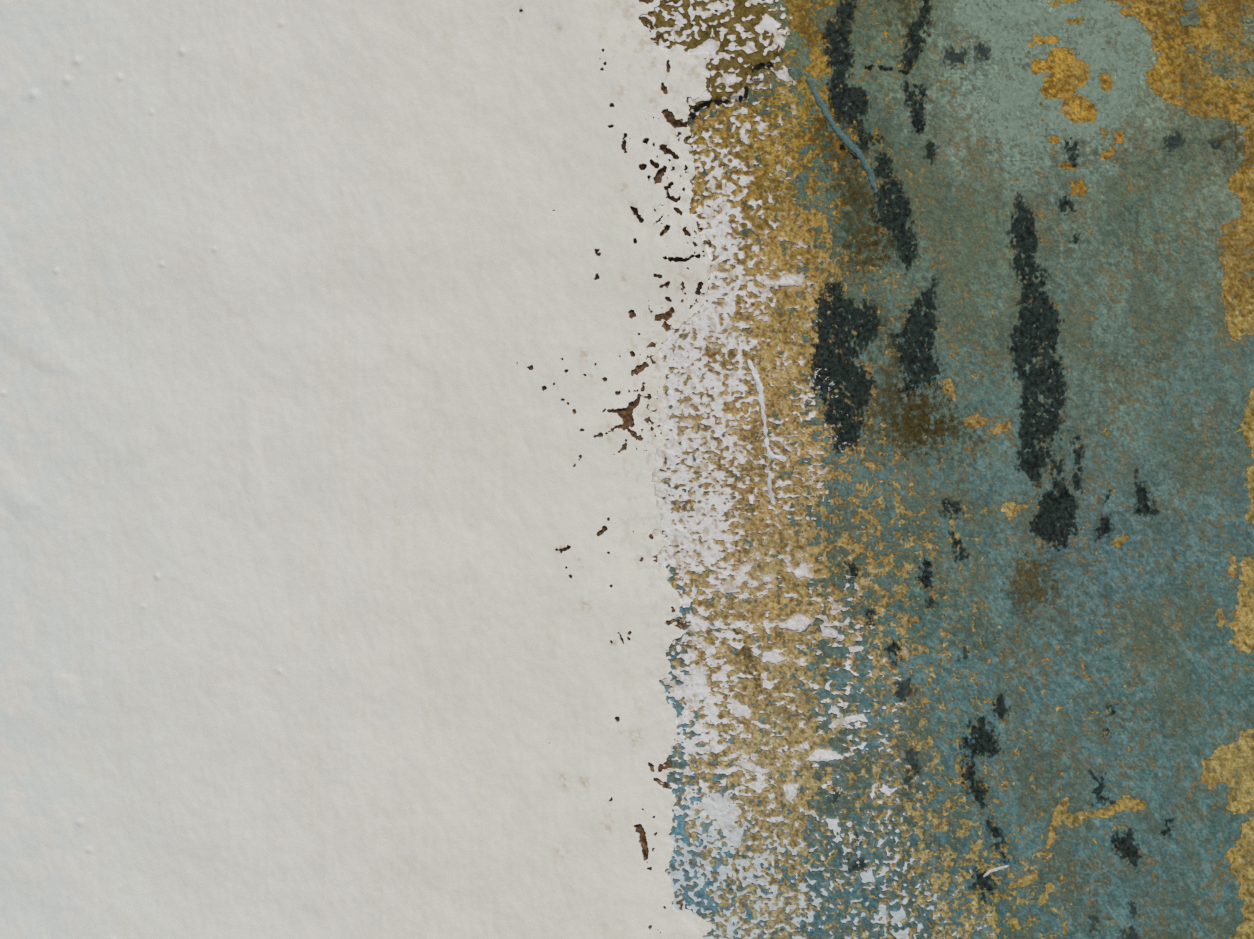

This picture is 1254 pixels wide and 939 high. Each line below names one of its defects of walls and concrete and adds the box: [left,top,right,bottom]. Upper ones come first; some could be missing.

peeling [1107,0,1254,341]
peeling [580,0,1147,939]
peeling [1236,387,1254,525]
peeling [1214,554,1254,654]
peeling [1200,728,1254,939]